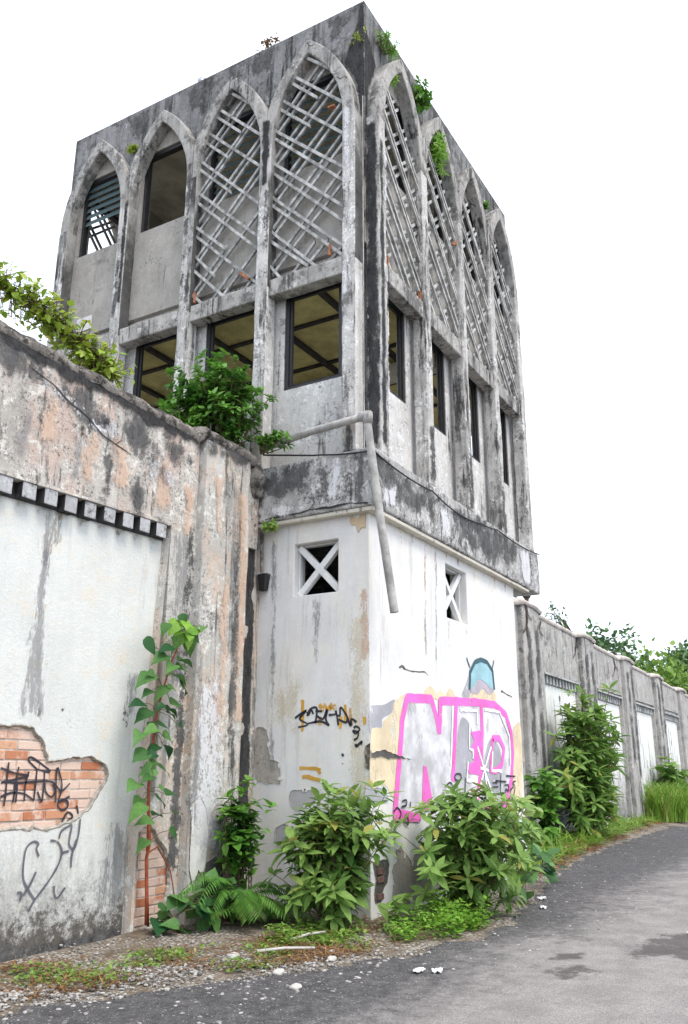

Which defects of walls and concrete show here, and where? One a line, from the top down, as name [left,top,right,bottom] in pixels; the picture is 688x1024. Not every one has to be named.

damp [239,45,280,76]
damp [188,75,215,113]
damp [126,108,149,140]
damp [328,3,533,585]
peeling [40,398,59,443]
damp [0,331,251,510]
damp [266,453,341,517]
peeling [349,514,366,533]
flaking render [0,723,109,832]
peeling [253,727,283,784]
flaking render [133,817,171,931]
flaking render [373,846,448,905]